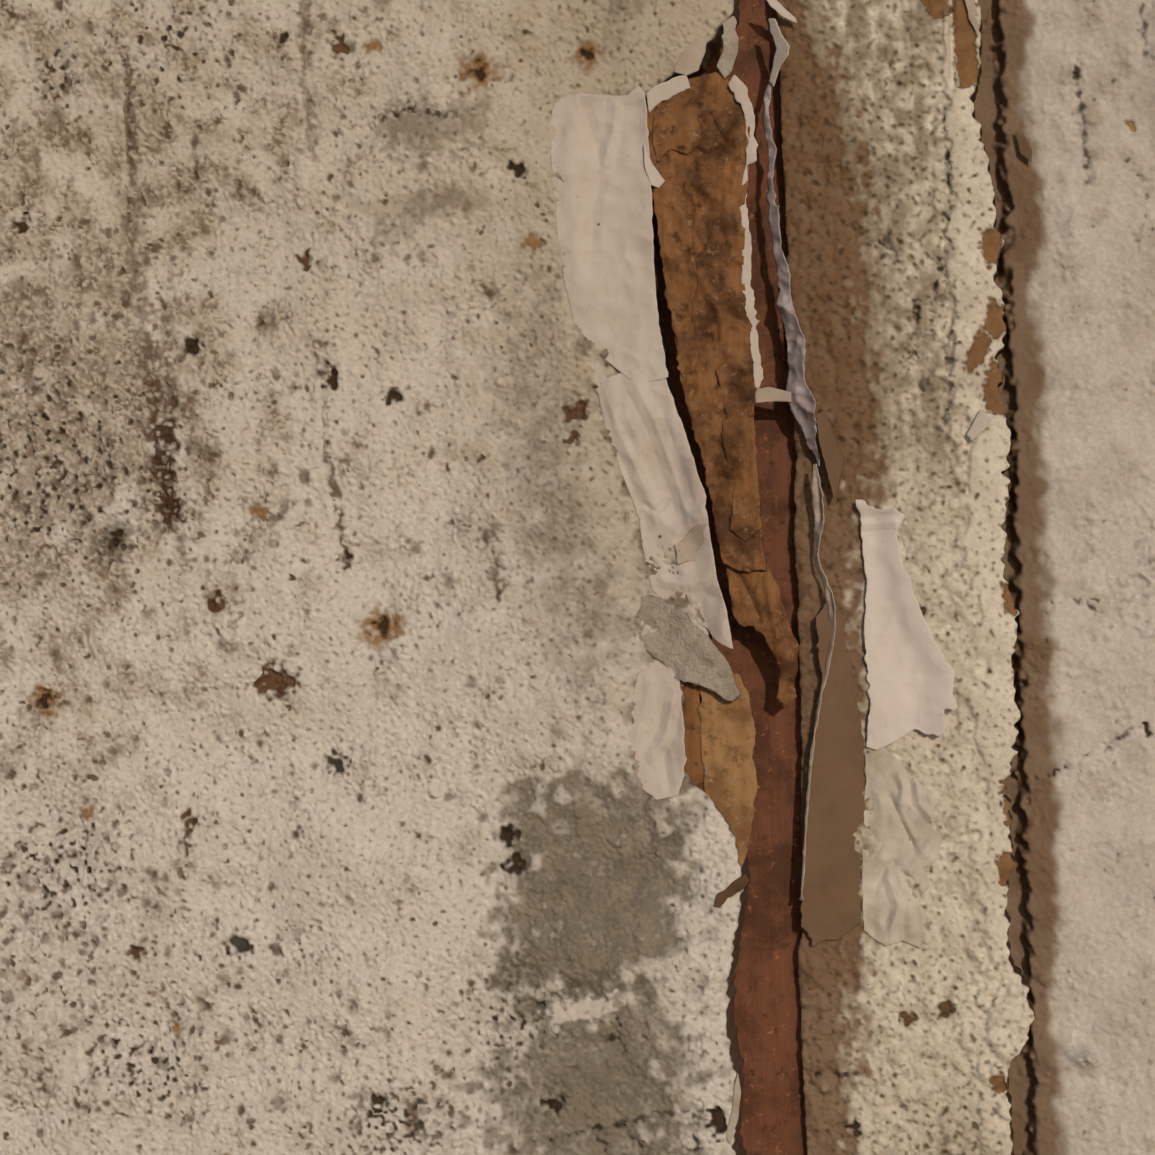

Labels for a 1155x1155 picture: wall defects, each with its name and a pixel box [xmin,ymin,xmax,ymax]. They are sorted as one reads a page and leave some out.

spalling [716,16,739,79]
spalling [921,0,979,89]
spalling [978,229,1002,269]
spalling [964,298,1006,417]
hole [562,400,589,444]
flaking render [635,595,741,702]
crack [815,1071,847,1079]